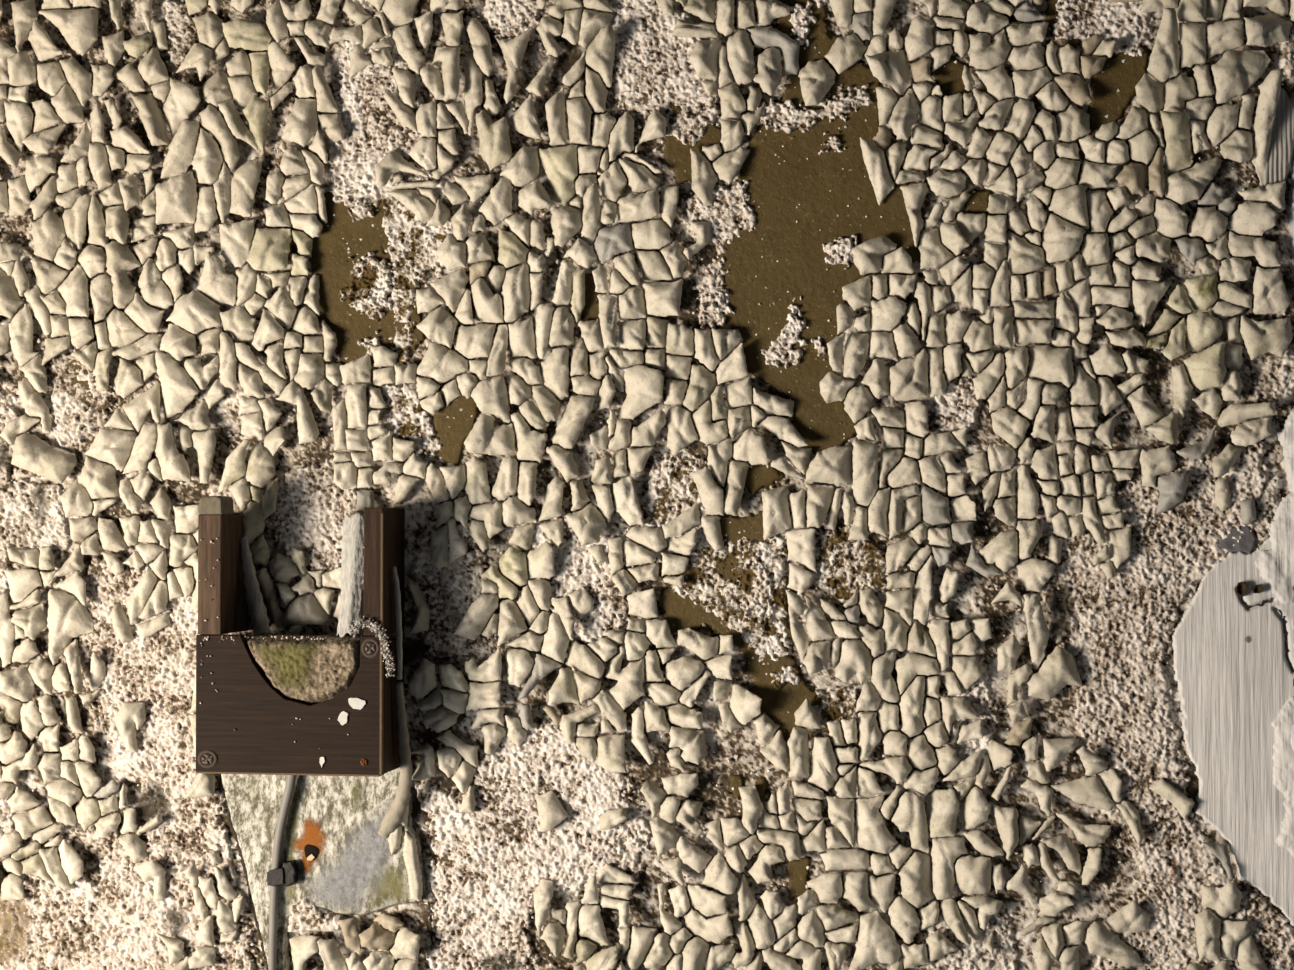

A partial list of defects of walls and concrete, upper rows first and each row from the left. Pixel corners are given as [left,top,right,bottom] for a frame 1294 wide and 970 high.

peeling [1188,65,1286,267]
peeling [889,263,1004,578]
peeling [988,267,1149,476]
peeling [1128,199,1293,427]
flaking render [882,555,1013,830]
flaking render [964,386,1294,970]
crack [1241,597,1294,672]
crack [215,776,268,970]
corrosion [294,819,325,873]
crack [427,901,435,950]
peeling [801,731,937,944]
flaking render [881,767,1019,970]